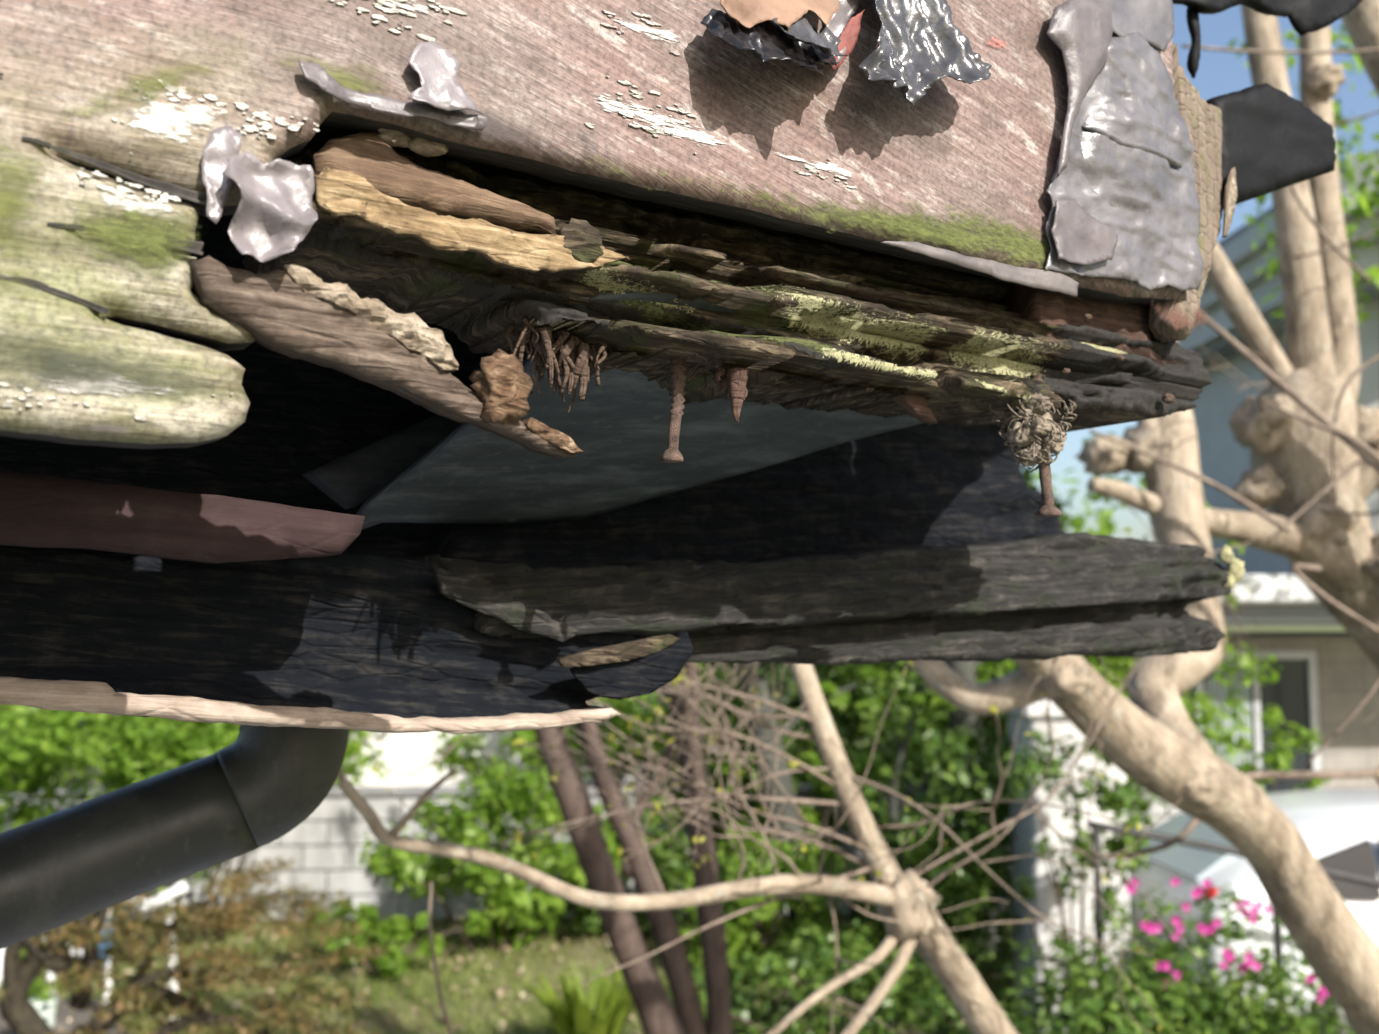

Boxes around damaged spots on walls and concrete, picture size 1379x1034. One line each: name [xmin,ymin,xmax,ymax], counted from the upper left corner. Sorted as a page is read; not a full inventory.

peeling [700,0,992,109]
crack [22,137,207,205]
crack [47,222,92,231]
leakage [72,210,194,276]
crack [169,238,204,255]
leakage [762,191,1050,268]
crack [0,275,109,315]